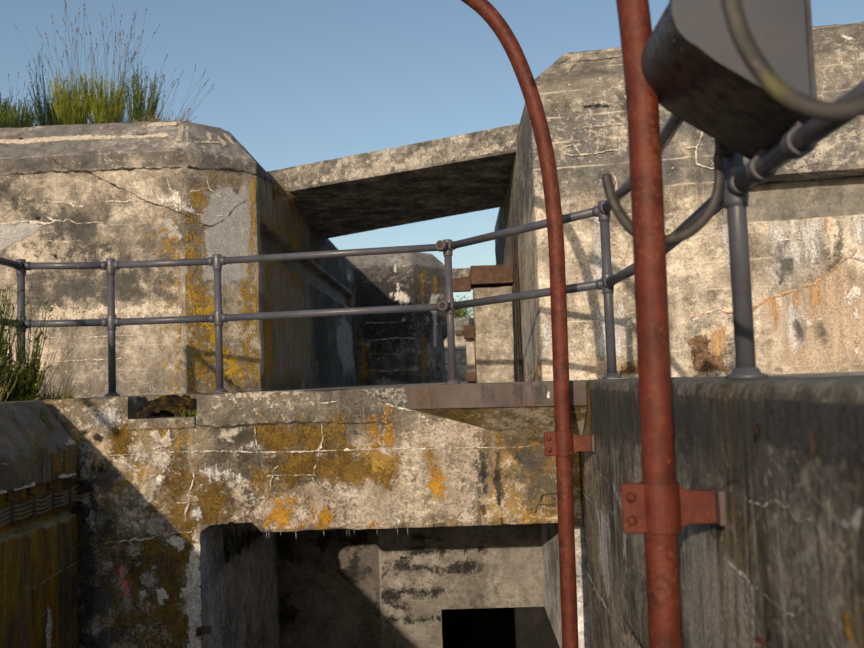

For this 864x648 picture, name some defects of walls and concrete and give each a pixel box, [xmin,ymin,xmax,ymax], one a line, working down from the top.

crack [686,132,714,169]
crack [0,158,280,248]
water stain [761,218,831,294]
rust [514,383,550,405]
spalling [620,360,638,375]
spalling [688,316,729,374]
water stain [200,467,242,484]
water stain [478,435,557,515]
water stain [580,452,611,601]
crack [721,445,824,618]
crack [576,556,642,648]
water stain [686,523,755,648]